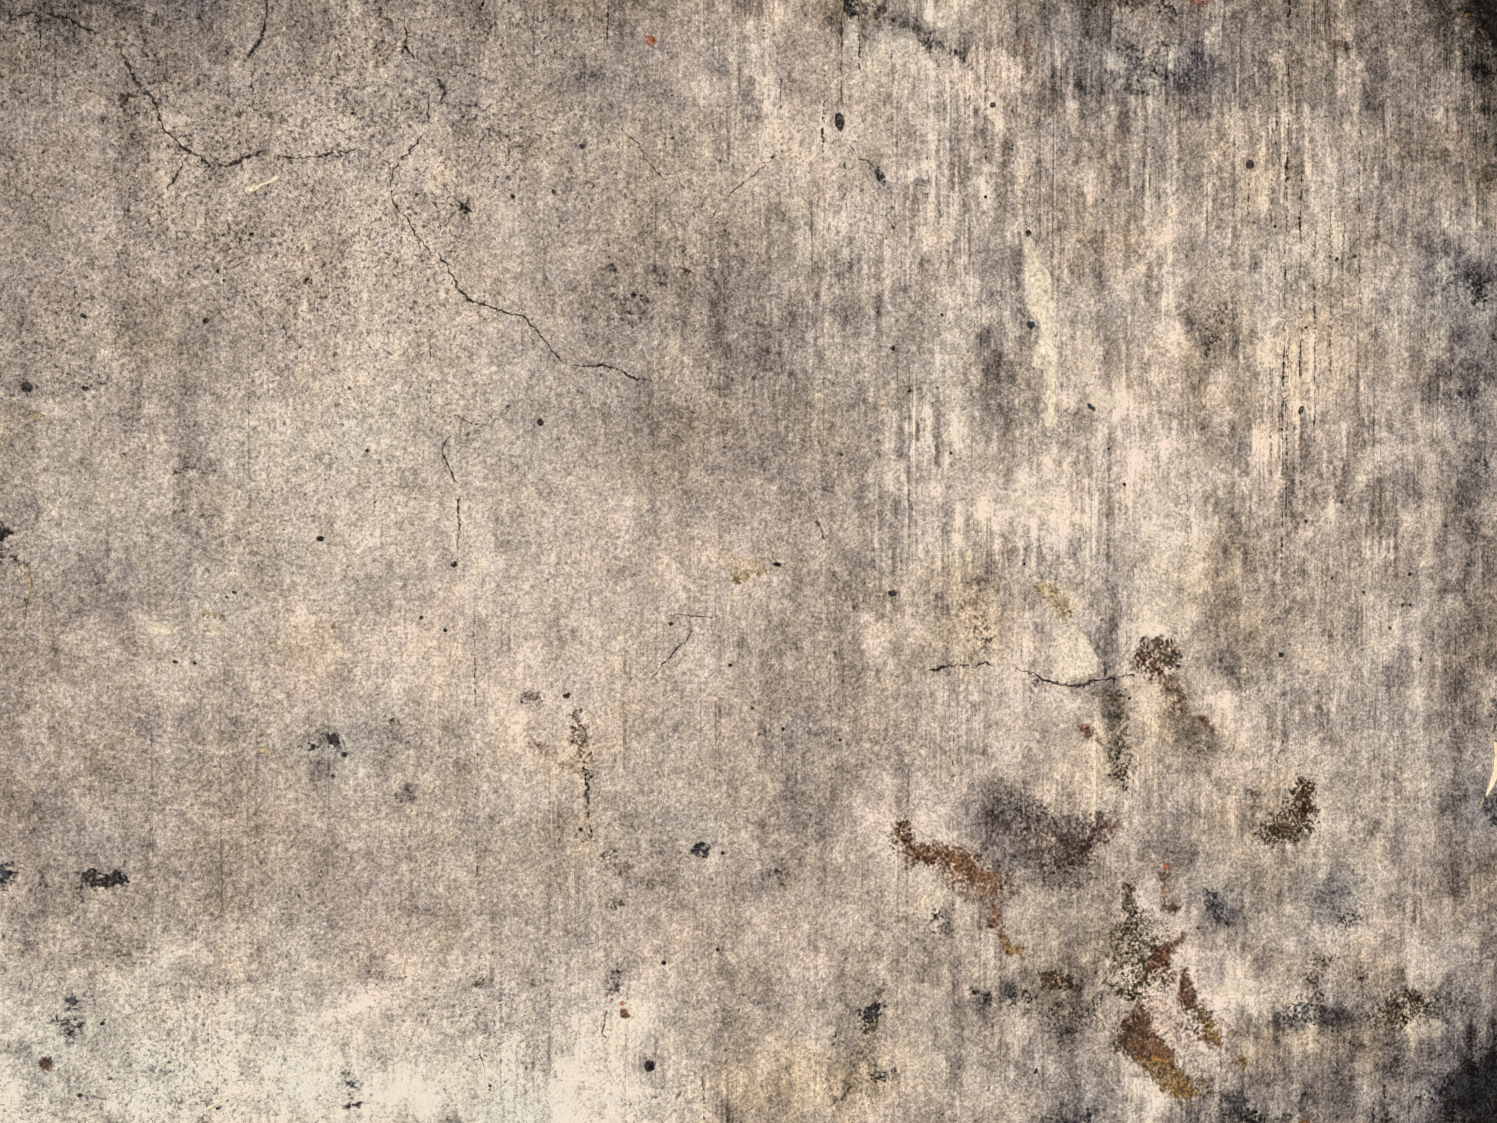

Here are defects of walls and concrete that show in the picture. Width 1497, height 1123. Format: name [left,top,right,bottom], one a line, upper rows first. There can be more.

crack [7,0,353,190]
crack [389,8,645,381]
rust [1057,811,1119,869]
rust [1254,777,1320,849]
rust [891,821,1234,1105]